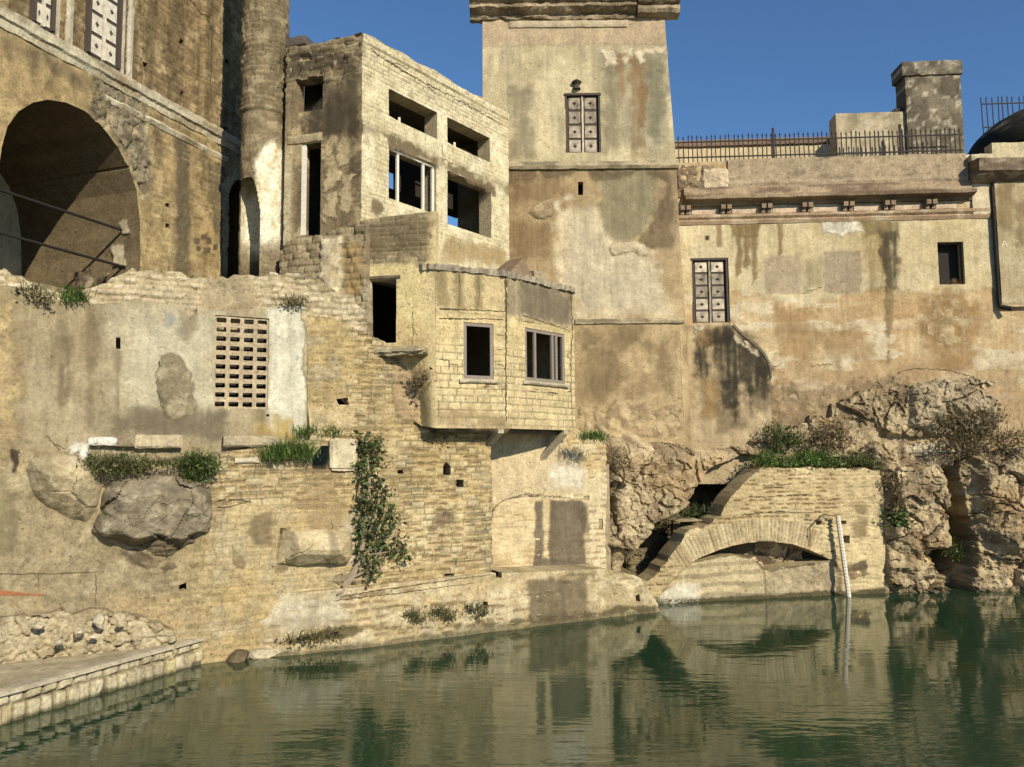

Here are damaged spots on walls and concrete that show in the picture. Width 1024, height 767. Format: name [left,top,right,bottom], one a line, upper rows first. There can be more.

damp [716,223,760,278]
damp [863,220,899,334]
spalling [156,353,198,420]
damp [695,326,773,431]
damp [528,465,590,622]